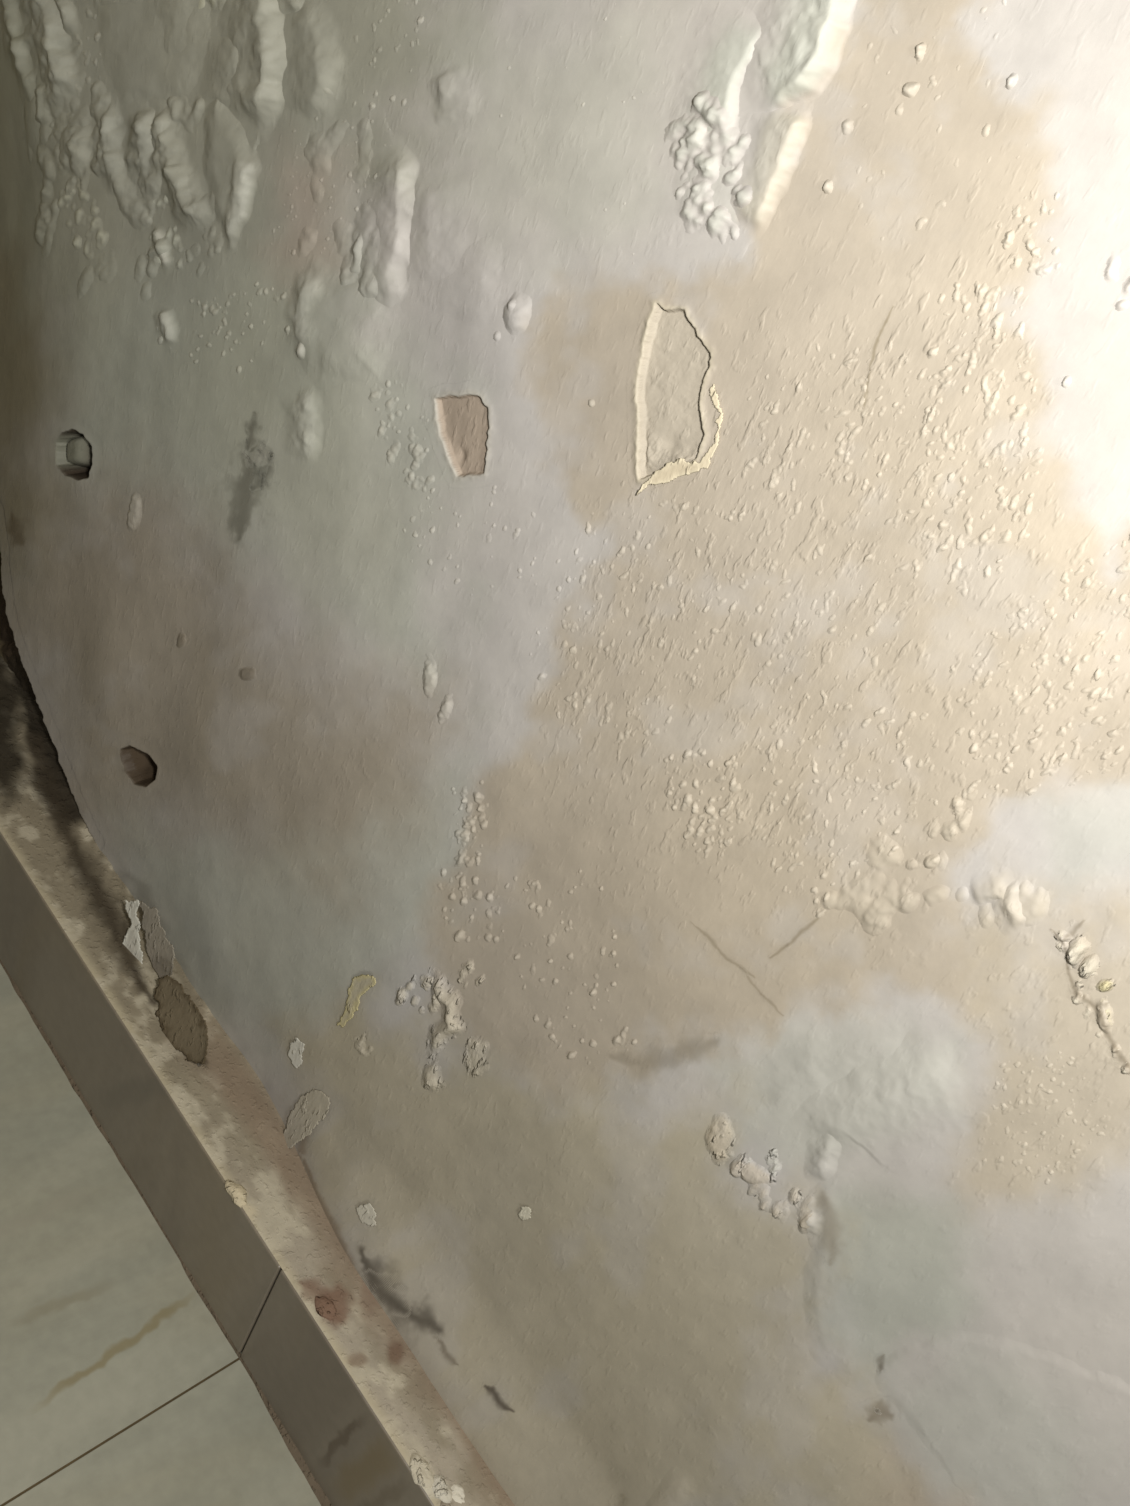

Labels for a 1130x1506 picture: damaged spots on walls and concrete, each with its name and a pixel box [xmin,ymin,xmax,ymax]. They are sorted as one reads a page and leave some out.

spalling [423,380,501,489]
spalling [626,290,724,495]
water stain [0,167,511,1016]
flaking render [0,502,104,851]
water stain [251,0,1130,1506]
peeling [122,899,208,1067]
peeling [337,974,376,1057]
flaking render [394,958,490,1093]
rust [294,1270,355,1330]